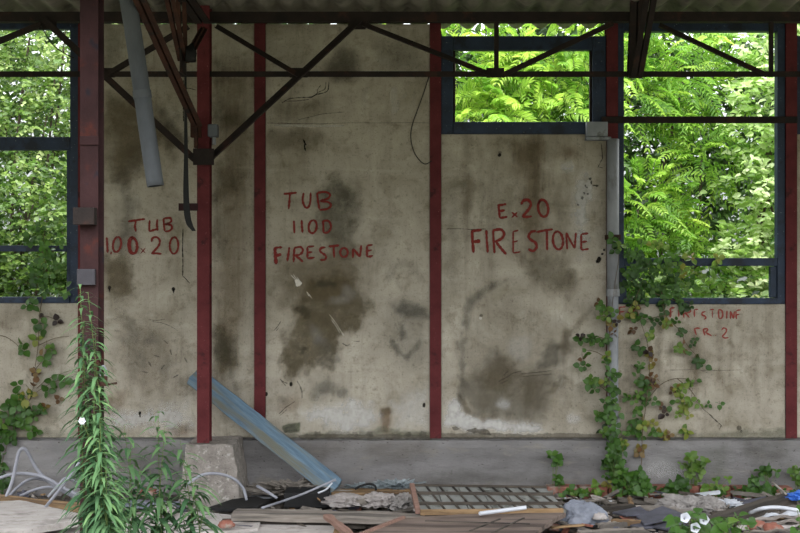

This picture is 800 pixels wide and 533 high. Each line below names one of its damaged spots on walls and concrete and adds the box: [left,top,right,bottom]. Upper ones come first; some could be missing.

water stain [109,99,141,175]
water stain [283,277,363,375]
water stain [446,402,506,430]